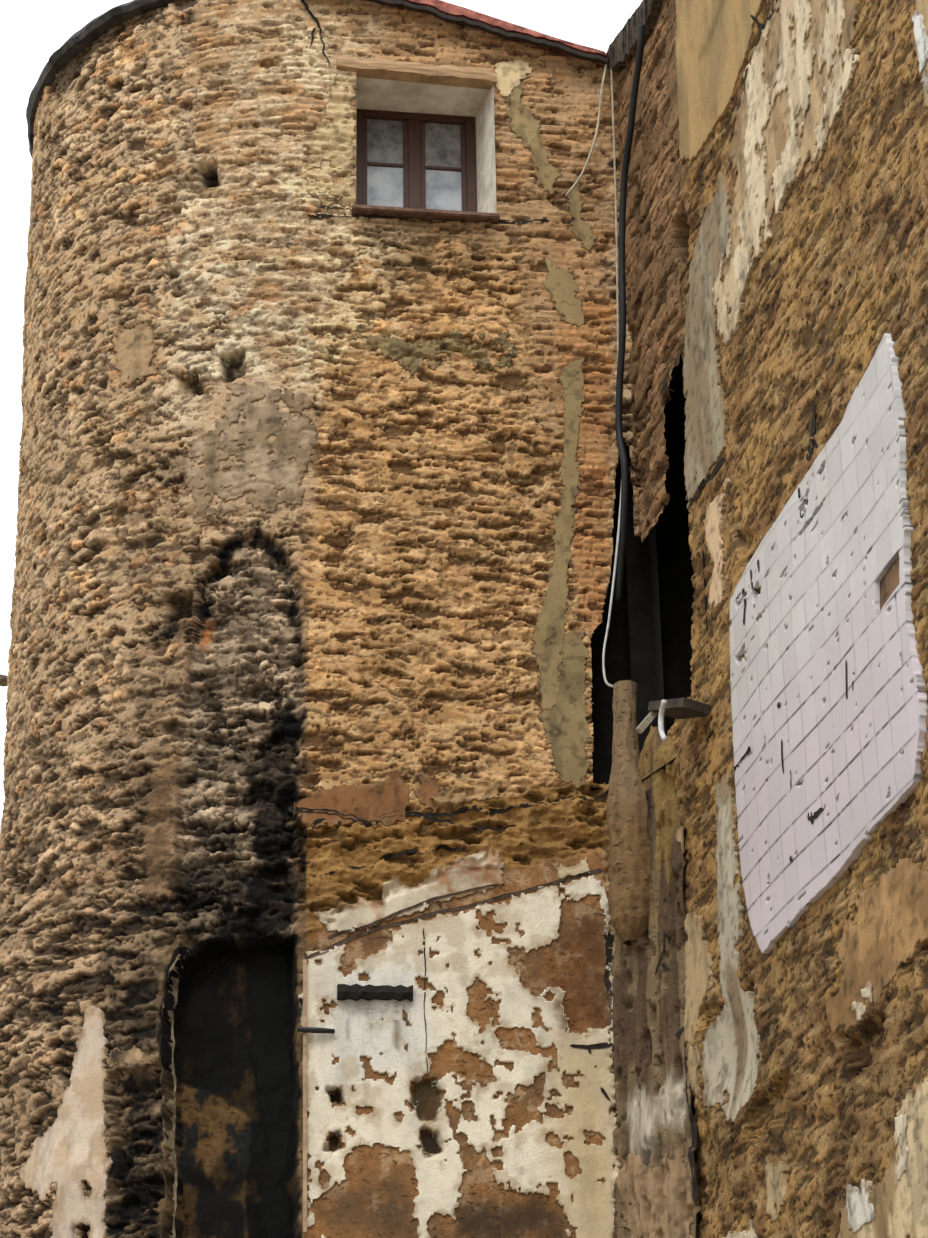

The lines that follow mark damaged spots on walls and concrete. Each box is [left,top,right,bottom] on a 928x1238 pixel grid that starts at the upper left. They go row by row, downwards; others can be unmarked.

crack [301,0,330,64]
peeling [626,0,860,752]
damp [153,616,178,646]
damp [286,581,306,663]
spalling [880,557,899,610]
damp [177,877,274,946]
peeling [683,774,762,1122]
peeling [20,1006,152,1238]
damp [175,940,303,1238]
peeling [298,846,696,1238]
peeling [838,1079,928,1238]